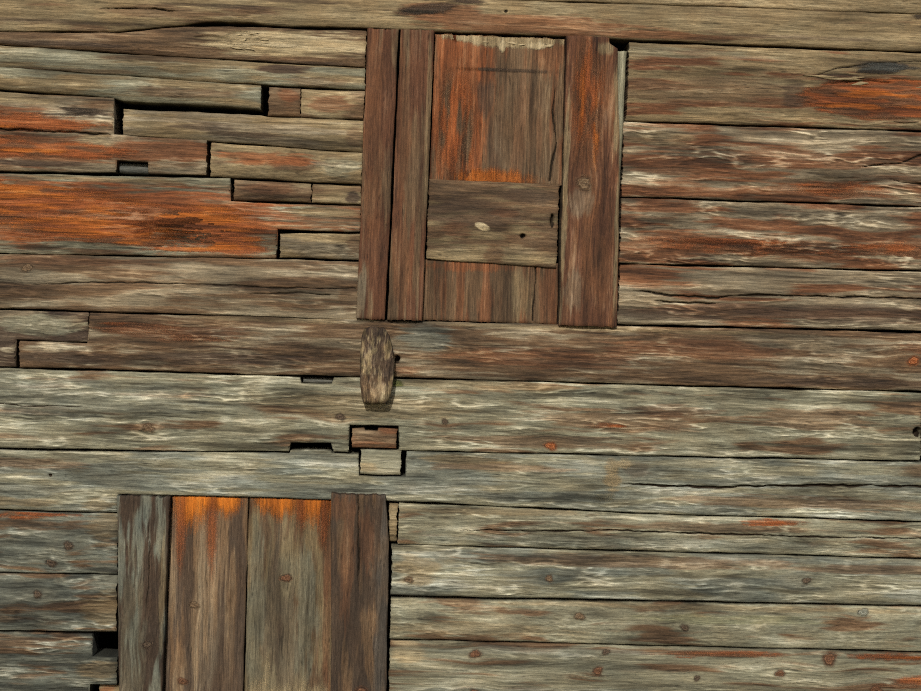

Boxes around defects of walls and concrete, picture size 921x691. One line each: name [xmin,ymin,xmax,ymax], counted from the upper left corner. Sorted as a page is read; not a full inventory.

crack [817,61,921,81]
corrosion [461,170,520,183]
corrosion [175,496,239,560]
corrosion [257,498,331,541]